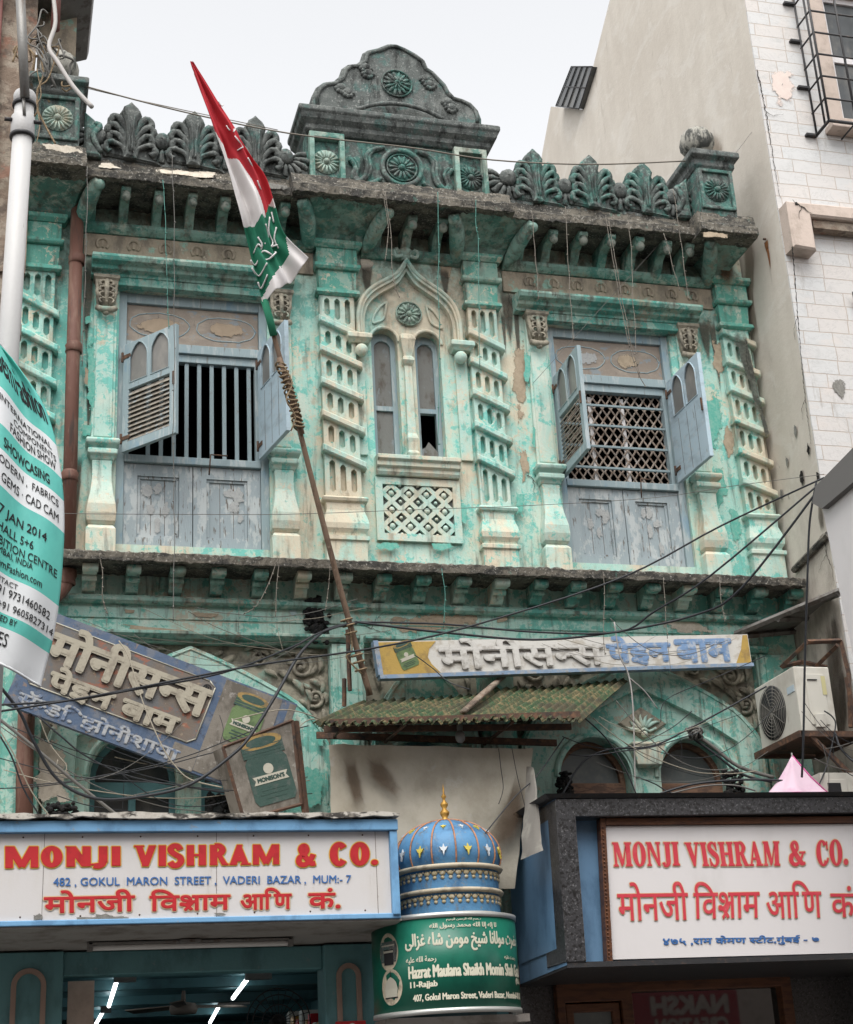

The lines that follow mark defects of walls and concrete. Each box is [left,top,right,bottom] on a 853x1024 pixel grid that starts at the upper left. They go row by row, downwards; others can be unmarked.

flaking render [42,143,83,153]
flaking render [156,169,221,178]
peeling [712,340,724,376]
peeling [512,341,531,424]
peeling [516,427,536,517]
peeling [707,392,742,542]
damp [346,764,362,800]